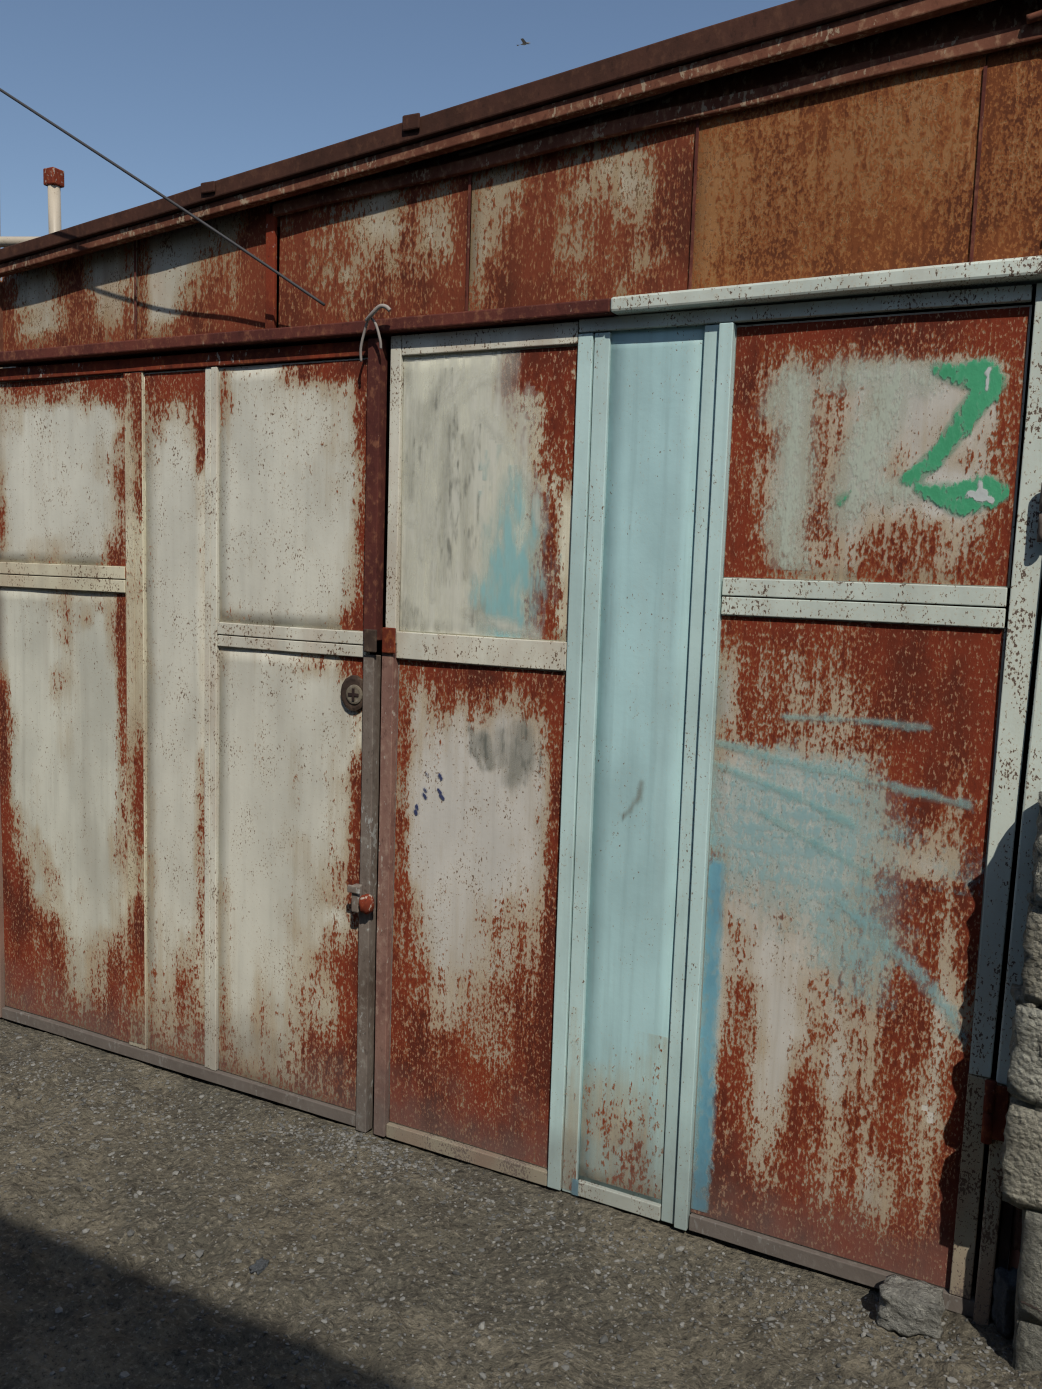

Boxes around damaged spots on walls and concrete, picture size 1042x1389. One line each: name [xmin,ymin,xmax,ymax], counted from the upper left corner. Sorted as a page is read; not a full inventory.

corrosion [0,359,368,1111]
corrosion [2,42,1042,351]
corrosion [390,659,666,1199]
corrosion [494,346,578,641]
corrosion [691,616,1004,1289]
corrosion [724,307,1030,586]